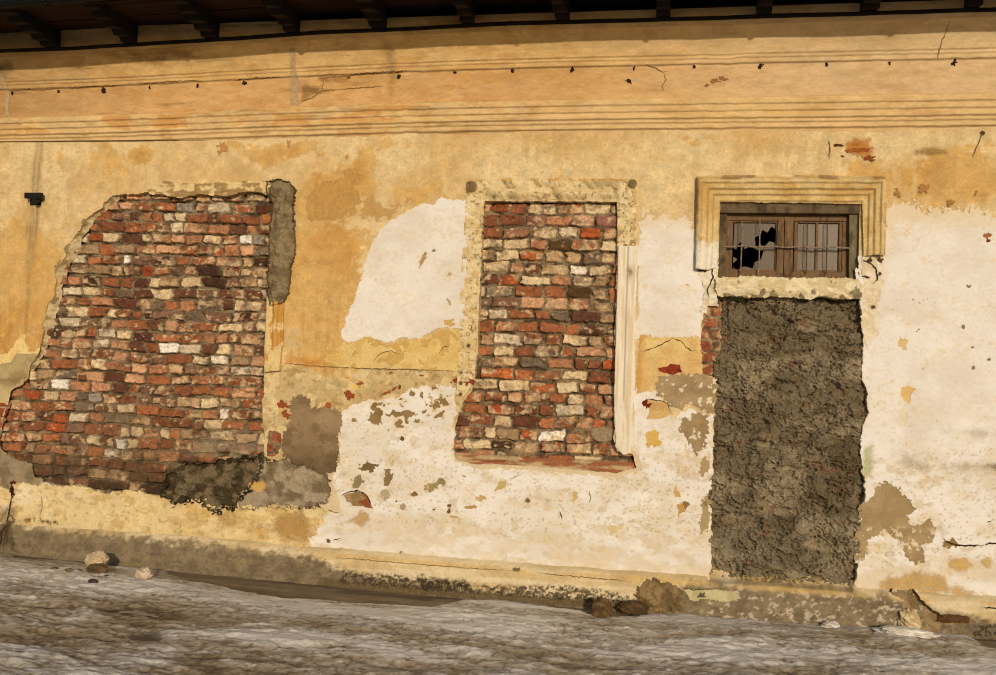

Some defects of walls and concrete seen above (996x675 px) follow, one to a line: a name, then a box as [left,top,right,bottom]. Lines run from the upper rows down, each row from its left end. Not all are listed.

flaking render [0,193,476,495]
peeling [635,261,722,477]
flaking render [860,256,885,351]
peeling [901,386,915,404]
peeling [341,459,446,510]
peeling [447,480,506,518]
peeling [674,485,712,535]
peeling [853,481,936,565]